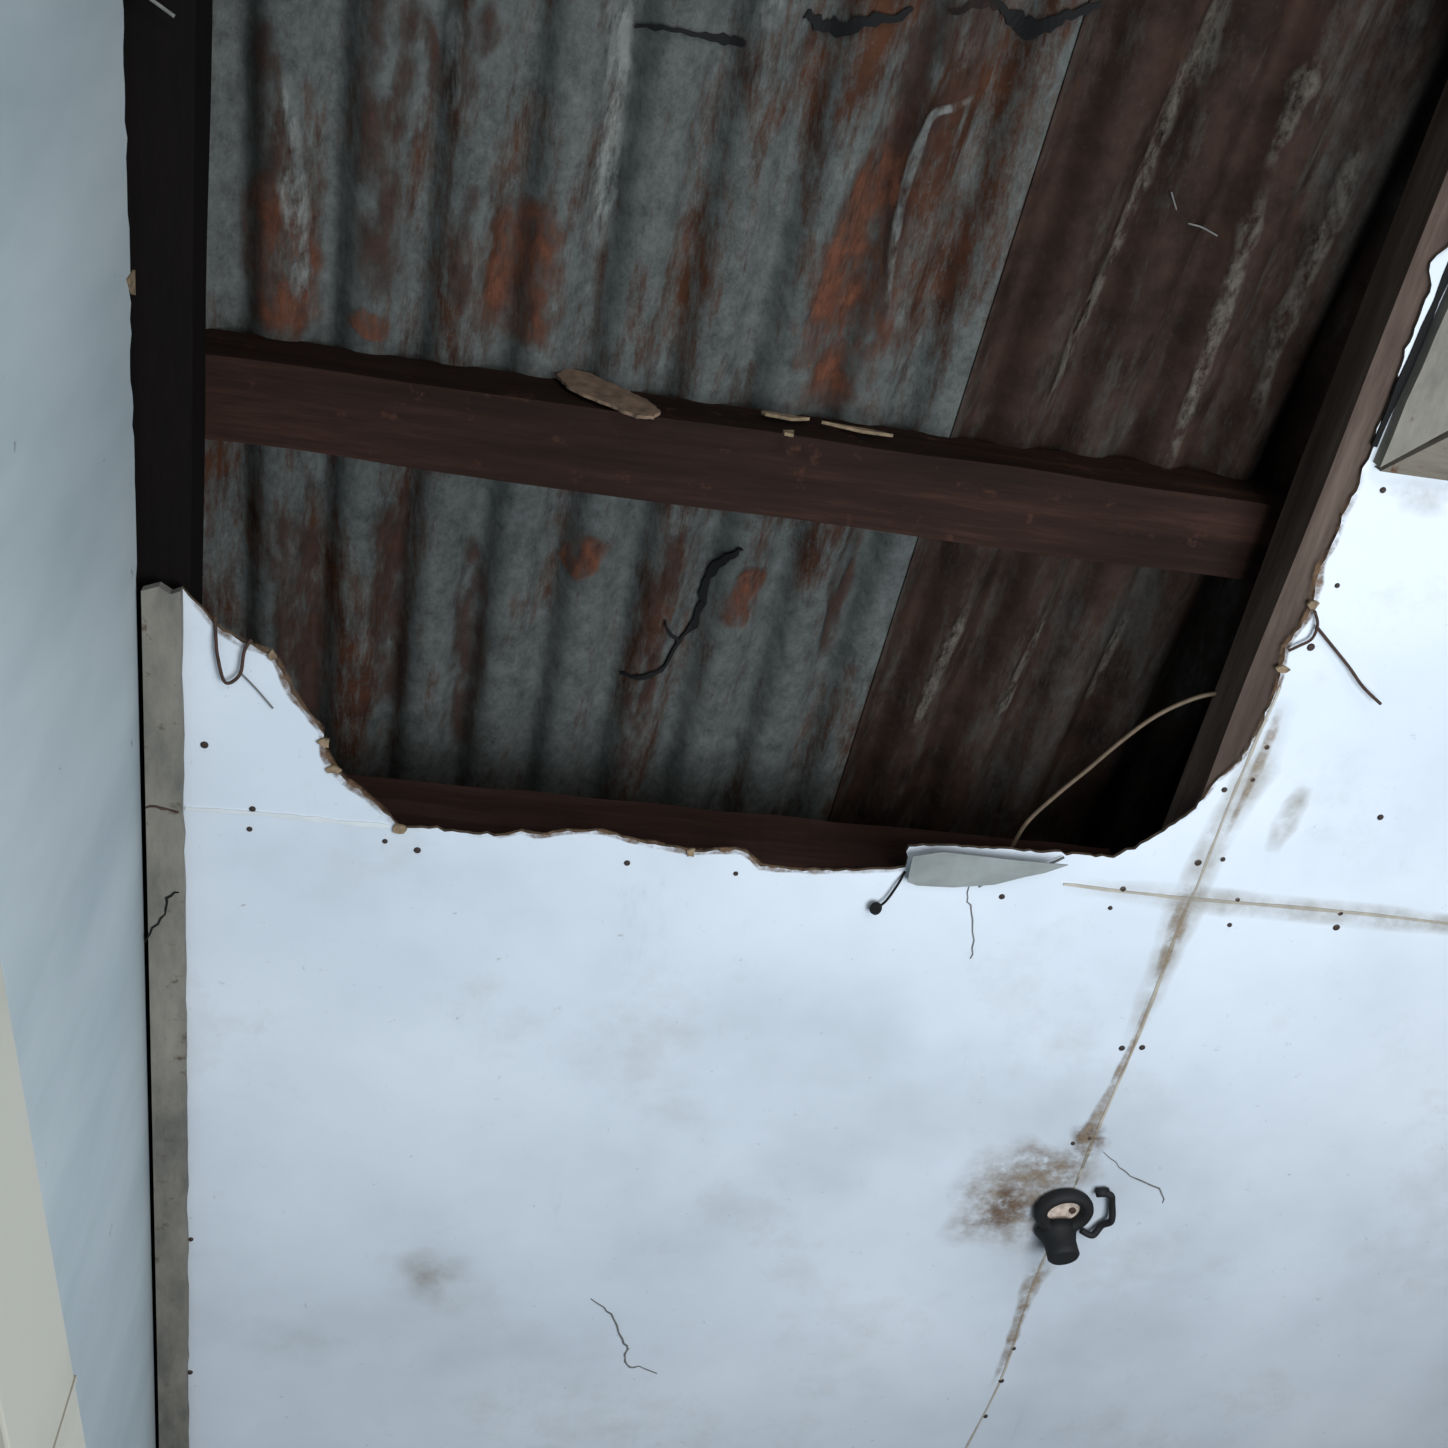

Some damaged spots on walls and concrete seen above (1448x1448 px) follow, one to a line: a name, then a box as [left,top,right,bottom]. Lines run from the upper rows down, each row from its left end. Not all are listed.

peeling [556,368,661,420]
peeling [761,410,893,437]
spalling [1272,552,1331,694]
spalling [260,647,375,804]
spalling [393,823,407,834]
spalling [598,829,657,844]
spalling [674,847,695,857]
spalling [714,848,791,872]
peeling [907,851,1068,888]
water stain [984,1162,1068,1223]
crack [591,1298,657,1374]